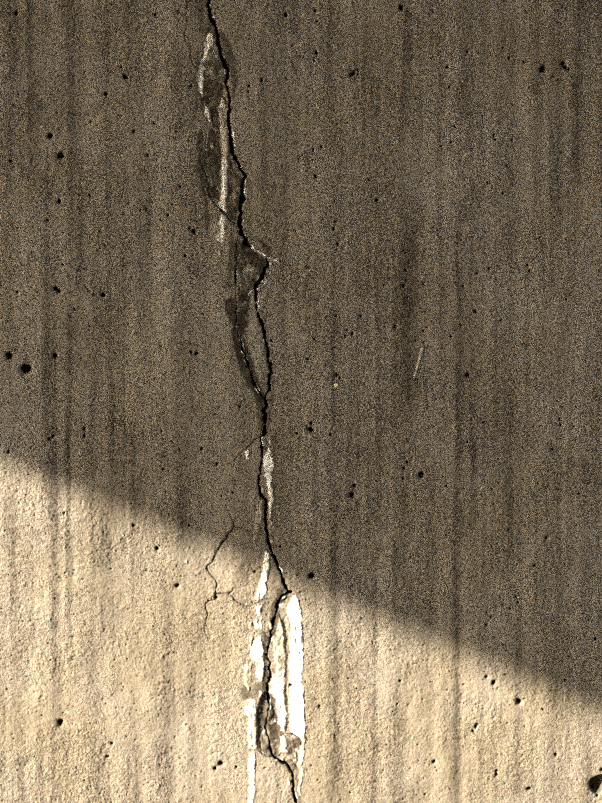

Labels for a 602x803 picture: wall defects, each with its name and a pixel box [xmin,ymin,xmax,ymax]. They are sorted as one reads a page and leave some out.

spalling [200,21,244,222]
leakage [193,0,280,544]
crack [183,0,309,803]
leakage [241,552,307,803]
spalling [260,596,303,765]